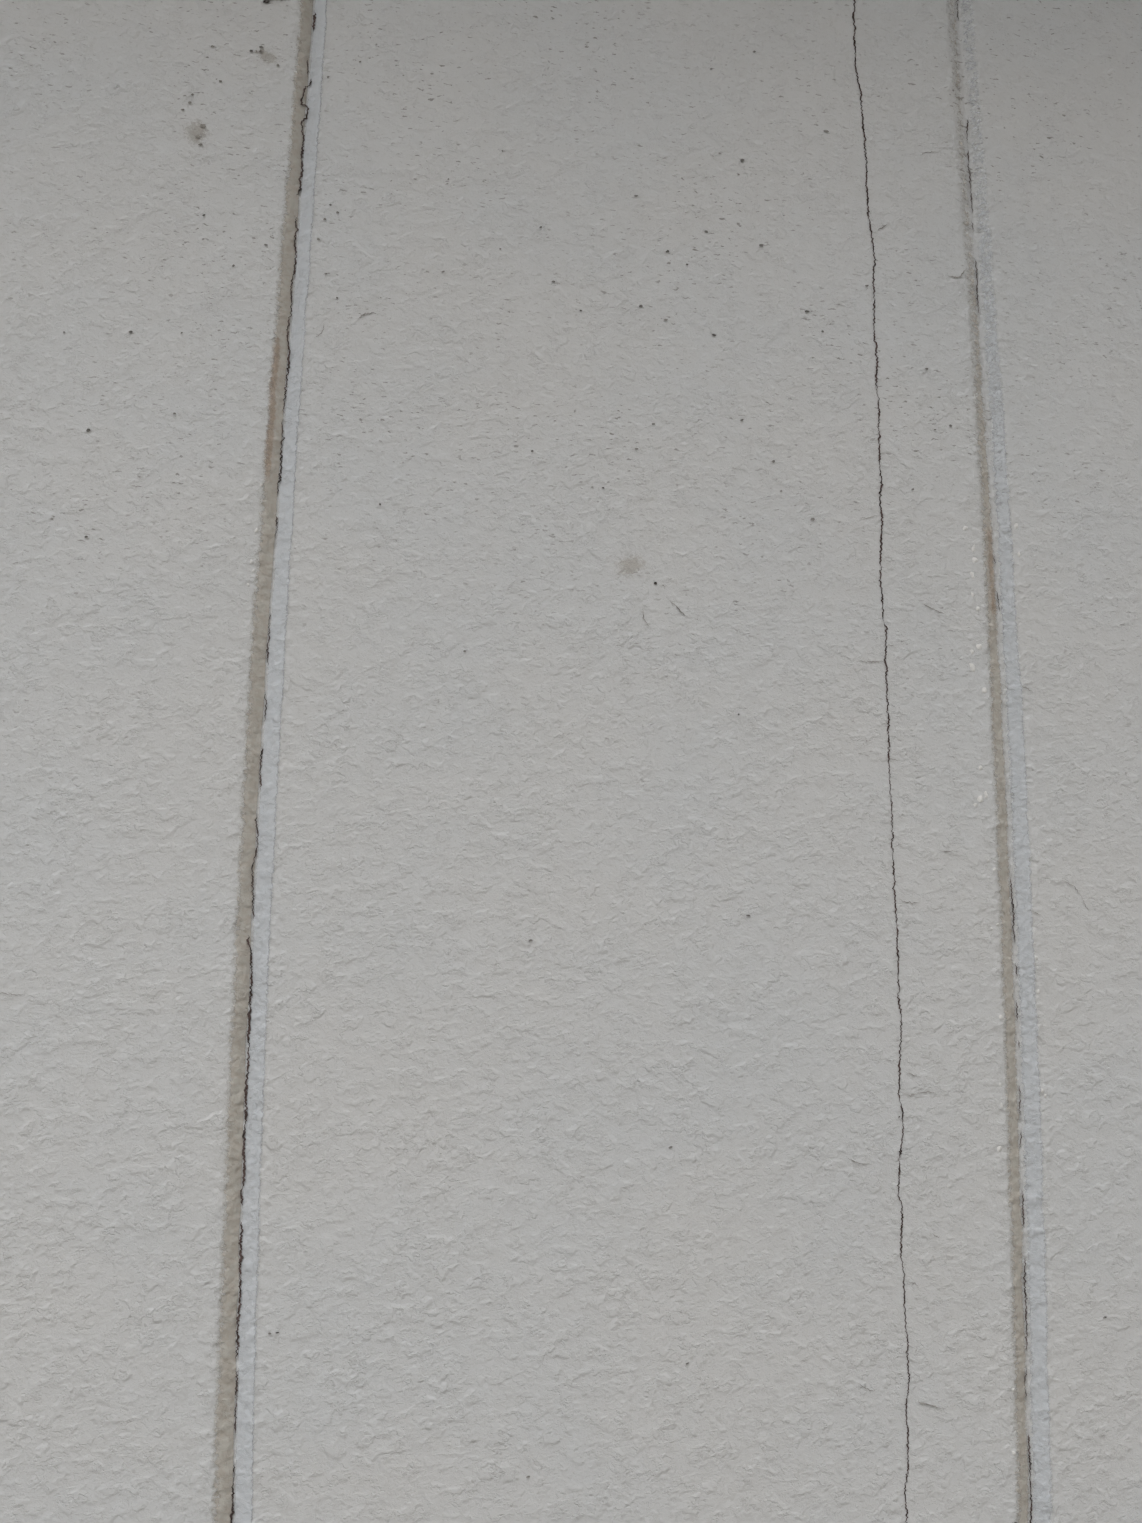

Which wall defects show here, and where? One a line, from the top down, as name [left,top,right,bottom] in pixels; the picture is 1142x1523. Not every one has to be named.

crack [852,0,939,1523]